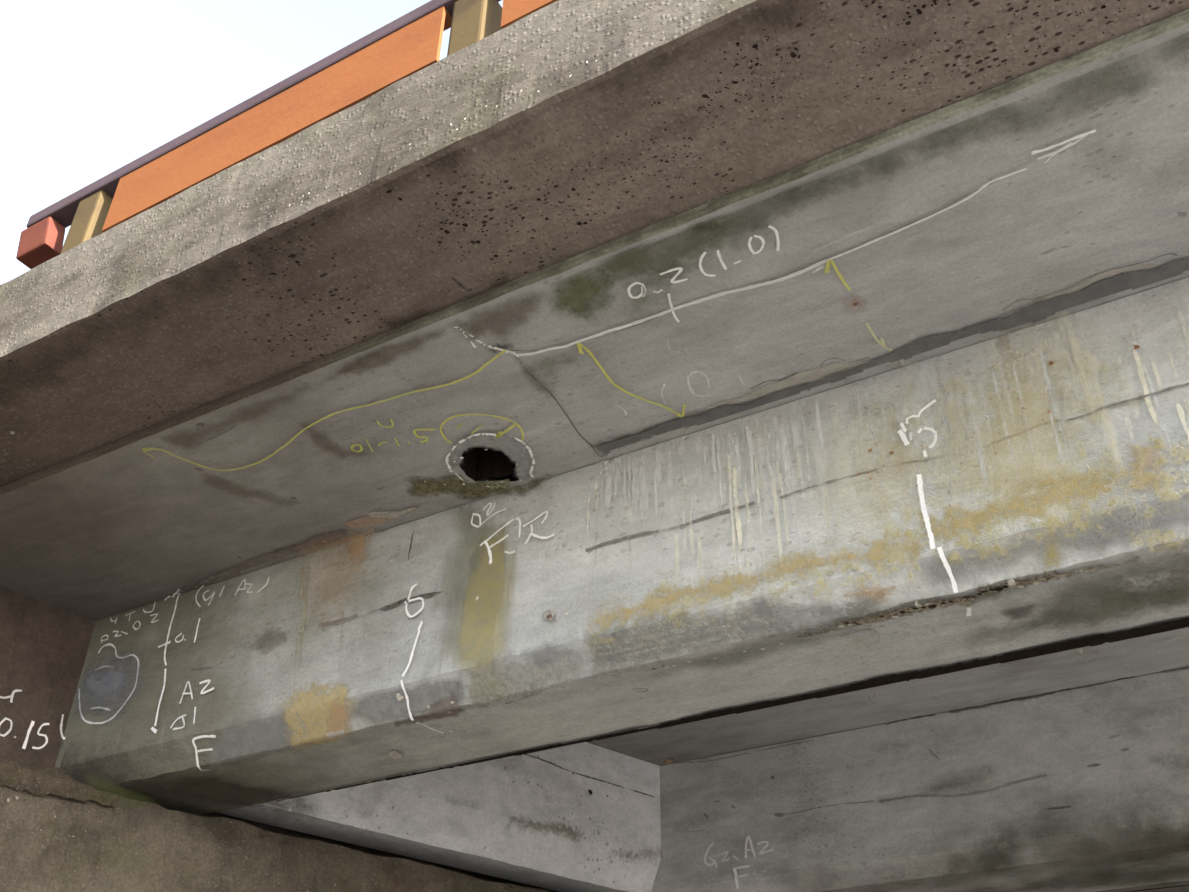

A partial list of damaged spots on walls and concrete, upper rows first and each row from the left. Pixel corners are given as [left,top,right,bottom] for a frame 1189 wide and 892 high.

crack [764,181,996,283]
leakage [343,332,441,372]
crack [391,313,430,328]
leakage [465,298,535,338]
crack [509,310,675,457]
leakage [696,433,758,550]
leakage [772,403,800,553]
leakage [442,511,486,599]
spalling [471,530,1189,708]
leakage [1008,565,1189,627]
corrosion [280,682,353,750]
leakage [60,618,1189,807]